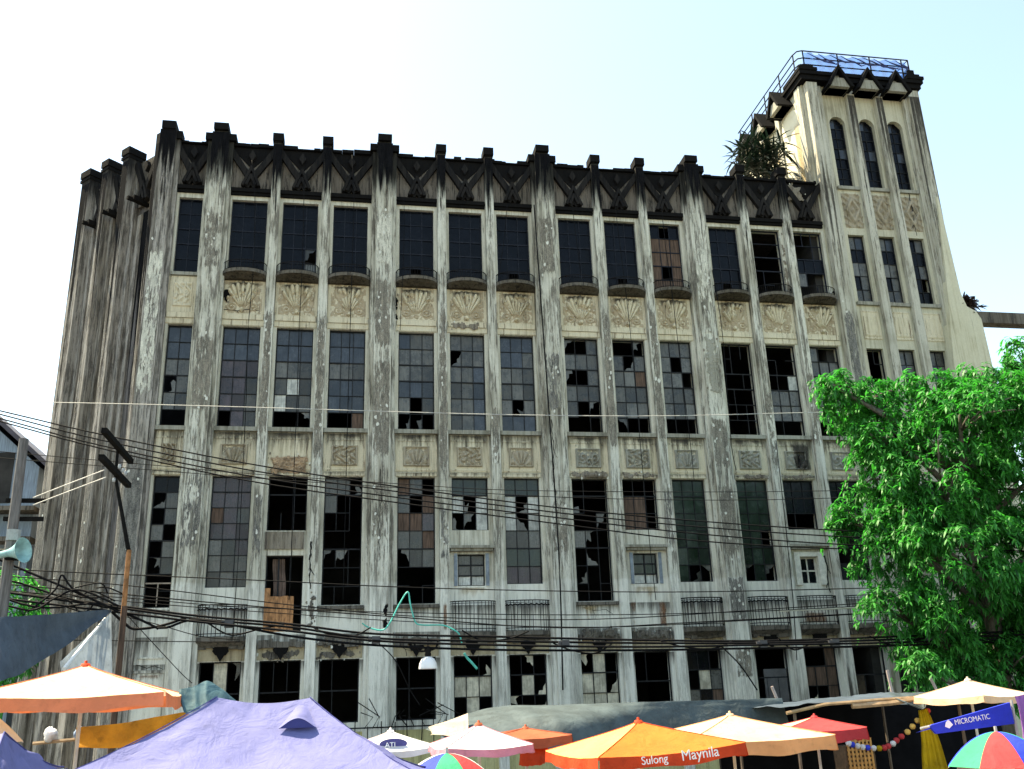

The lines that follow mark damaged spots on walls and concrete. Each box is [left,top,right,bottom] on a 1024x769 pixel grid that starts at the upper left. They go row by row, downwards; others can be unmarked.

damp [59,172,108,422]
damp [102,160,129,360]
peeling [136,237,163,393]
damp [535,153,551,197]